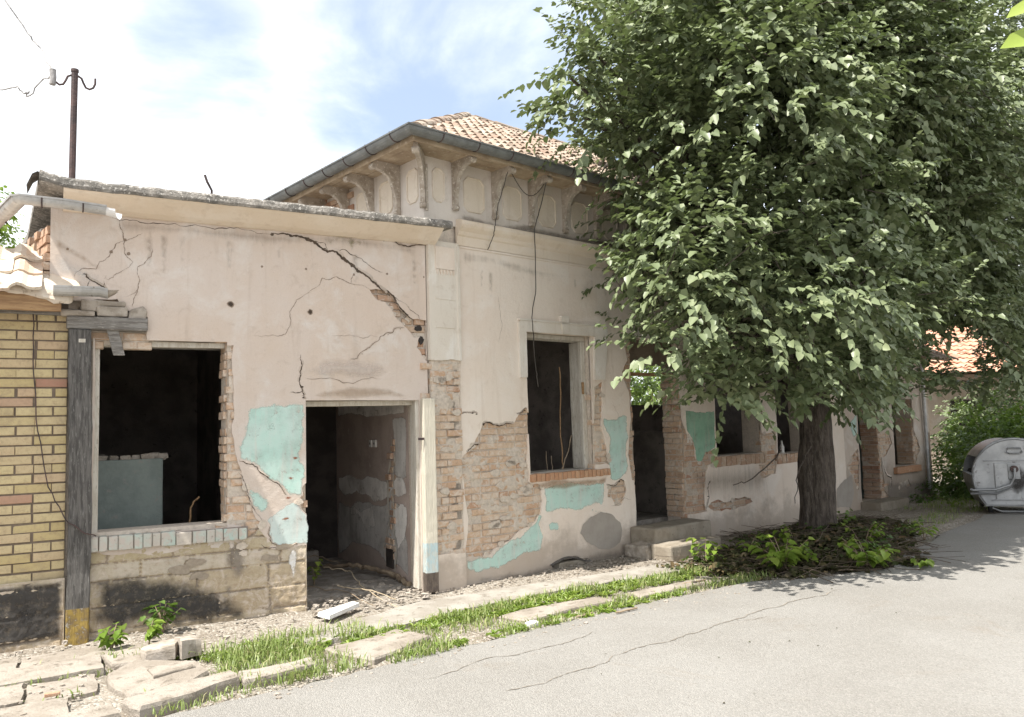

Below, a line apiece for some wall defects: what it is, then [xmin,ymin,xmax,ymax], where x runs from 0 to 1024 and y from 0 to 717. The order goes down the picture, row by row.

crack [74,219,419,360]
leakage [0,584,60,646]
leakage [98,580,240,626]
spalling [89,342,308,640]
leakage [230,546,242,573]
crack [294,355,306,399]
peeling [338,405,408,575]
spalling [370,289,638,572]